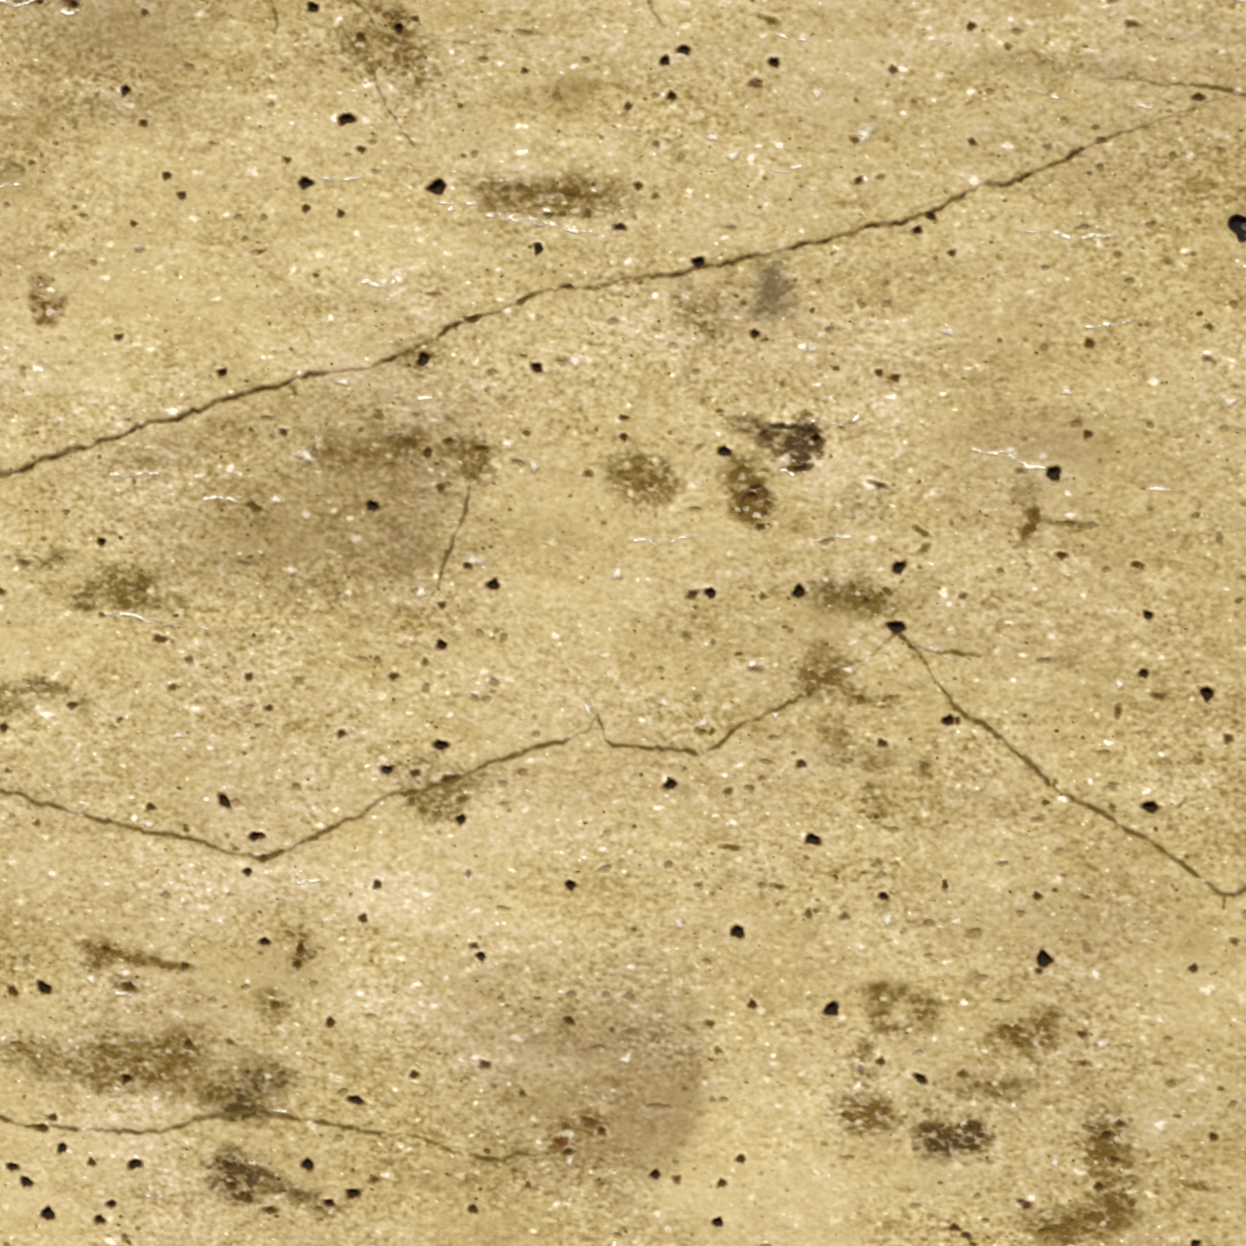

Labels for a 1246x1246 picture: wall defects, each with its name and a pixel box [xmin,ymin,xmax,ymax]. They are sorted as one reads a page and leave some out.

crack [517,132,1121,304]
crack [0,371,328,477]
damp [737,417,824,472]
damp [725,456,771,525]
crack [597,672,834,755]
crack [0,739,569,860]
crack [892,633,1246,903]
damp [13,1032,291,1122]
crack [0,1110,383,1135]
damp [207,1147,324,1212]
damp [917,1119,991,1157]
damp [1029,1111,1135,1243]